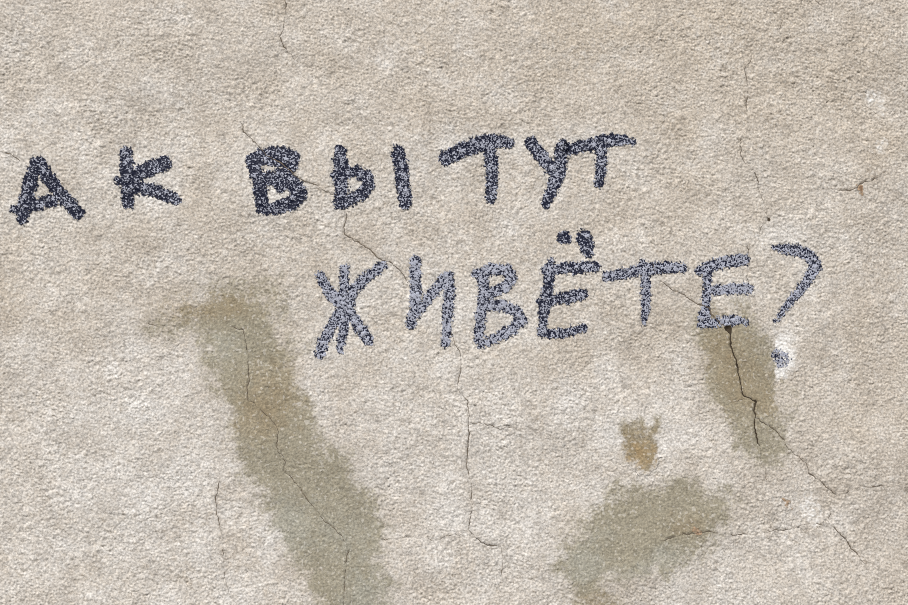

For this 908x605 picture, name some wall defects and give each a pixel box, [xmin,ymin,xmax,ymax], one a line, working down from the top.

leakage [118,258,415,605]
crack [231,326,349,605]
leakage [533,278,812,605]
crack [623,236,891,563]
leakage [788,487,825,532]